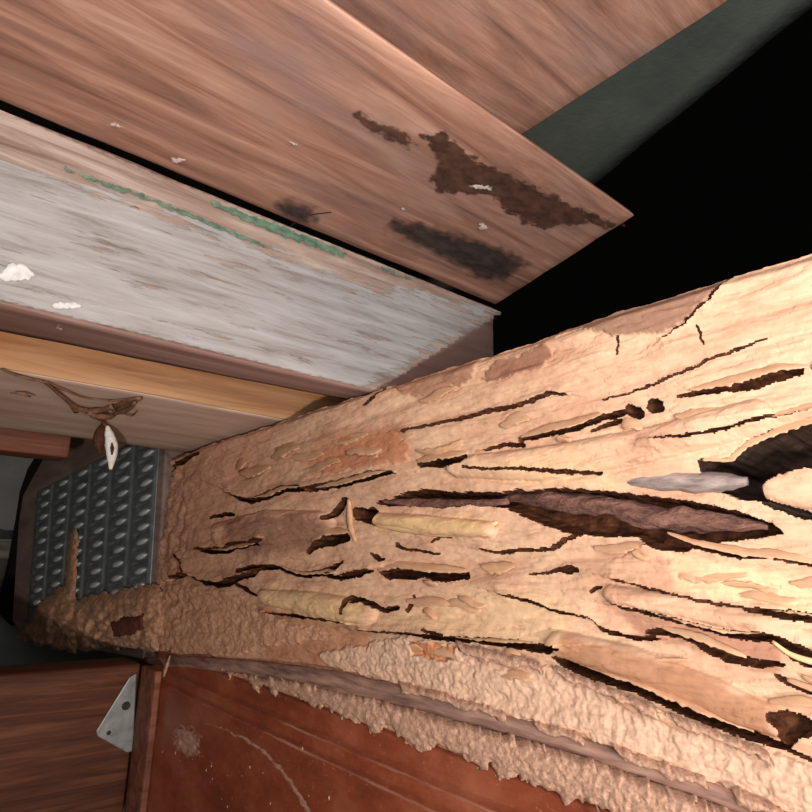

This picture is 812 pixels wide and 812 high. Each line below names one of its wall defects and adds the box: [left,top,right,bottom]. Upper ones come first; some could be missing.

water stain [353,111,625,230]
water stain [391,220,522,279]
crack [602,279,768,401]
crack [363,387,387,406]
crack [400,391,567,433]
crack [648,402,812,439]
crack [209,483,332,519]
crack [479,533,598,576]
crack [643,531,812,567]
crack [168,537,559,655]
crack [589,579,812,623]
crack [497,593,812,695]